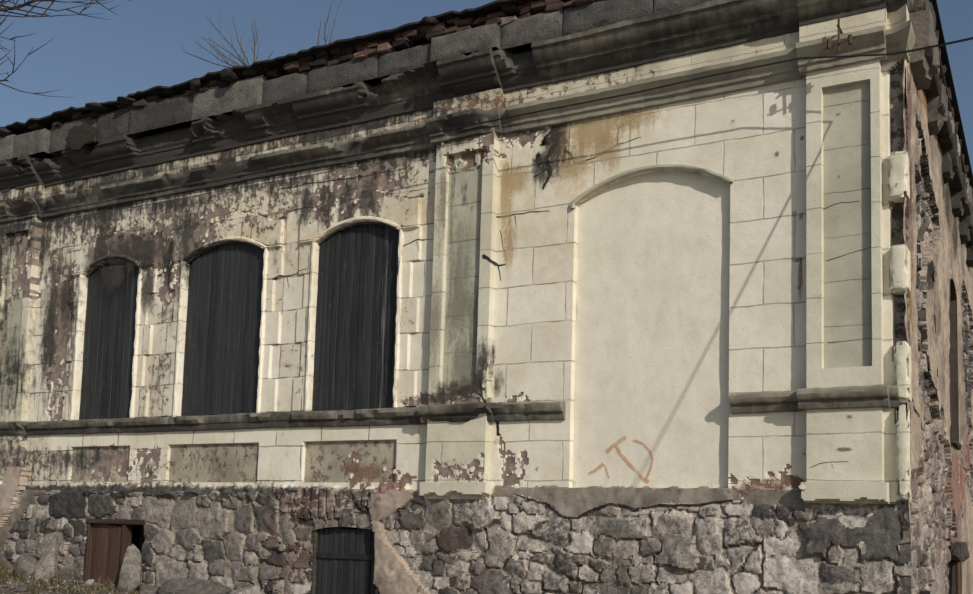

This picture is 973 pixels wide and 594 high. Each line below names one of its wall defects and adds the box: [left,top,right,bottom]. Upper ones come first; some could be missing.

water stain [500,111,650,262]
spalling [962,172,973,206]
flaking render [926,260,937,290]
peeling [0,205,230,421]
water stain [432,381,482,403]
spalling [275,451,417,520]
peeling [433,453,485,484]
peeling [495,434,529,488]